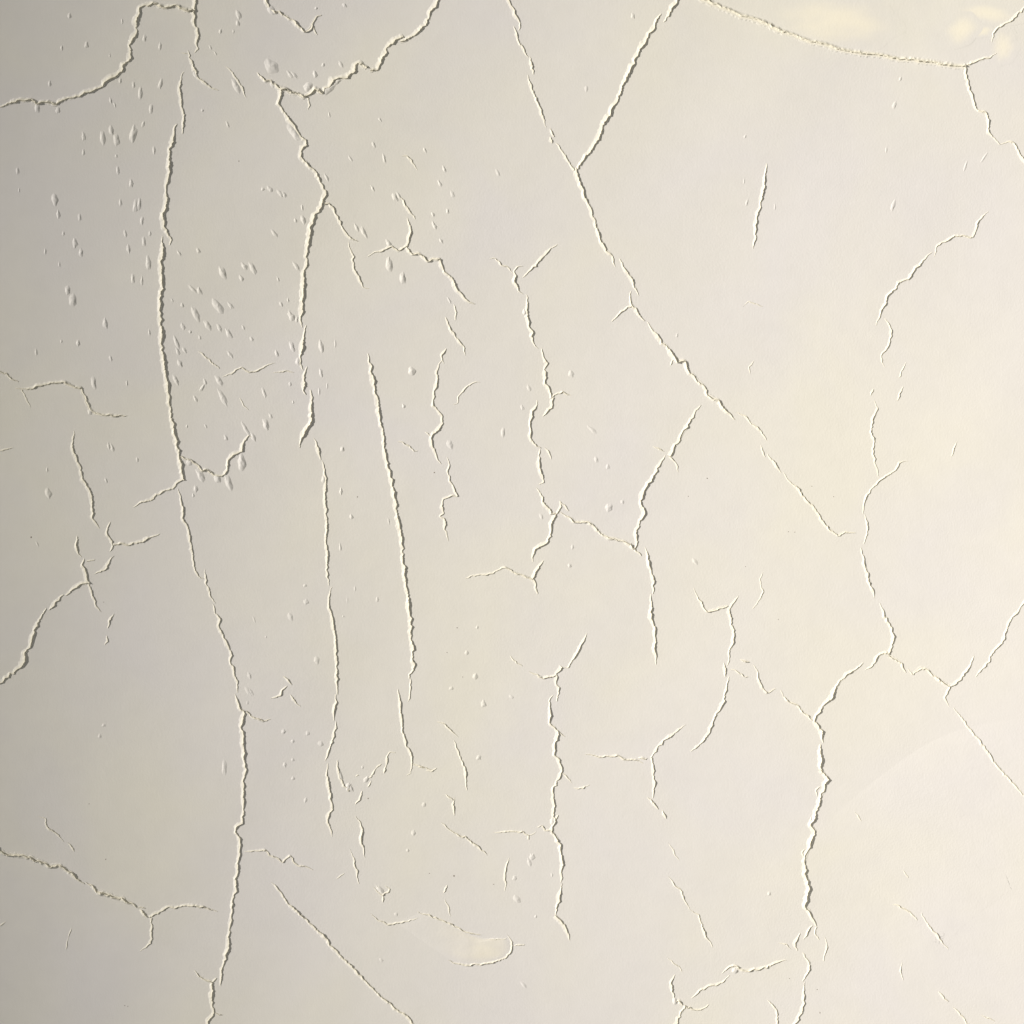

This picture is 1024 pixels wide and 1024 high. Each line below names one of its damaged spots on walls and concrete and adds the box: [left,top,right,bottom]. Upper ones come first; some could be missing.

crack [0,0,478,1024]
crack [438,634,589,941]
crack [465,0,1024,1024]